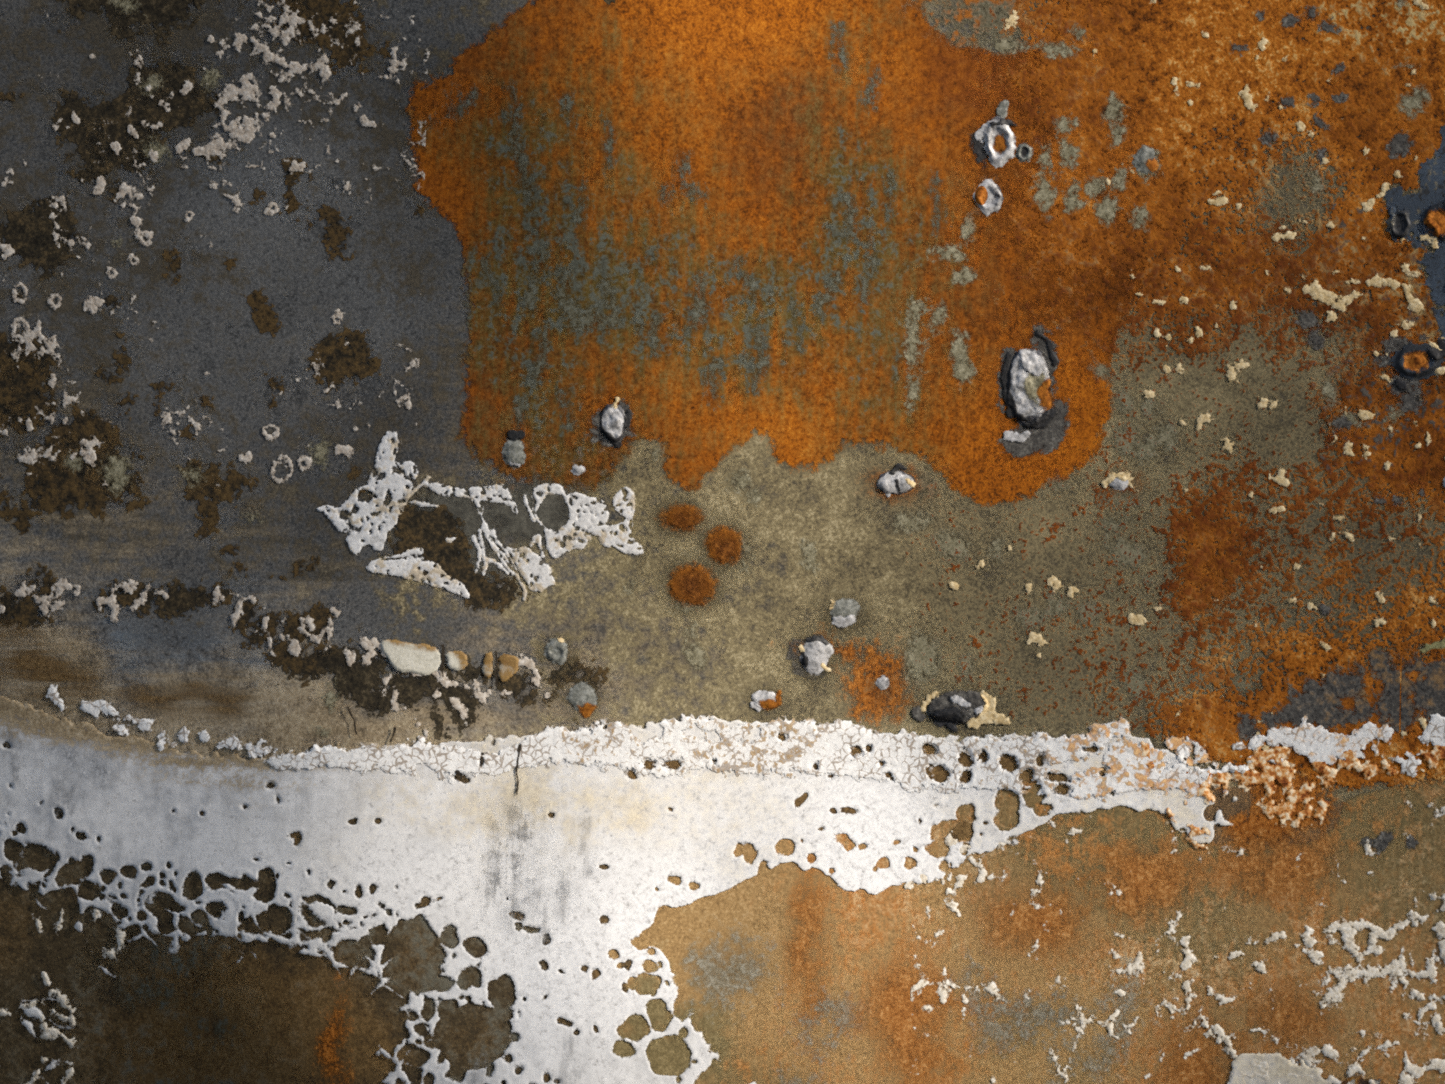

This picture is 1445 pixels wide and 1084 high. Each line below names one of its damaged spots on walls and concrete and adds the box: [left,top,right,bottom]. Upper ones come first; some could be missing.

peeling [175,0,430,213]
water stain [1399,87,1431,119]
peeling [47,49,193,341]
peeling [1284,125,1445,448]
peeling [0,280,102,475]
water stain [1090,364,1178,465]
peeling [317,431,643,601]
water stain [894,474,970,562]
water stain [1095,488,1153,585]
water stain [904,632,977,689]
peeling [0,562,1445,1084]
rust [1103,845,1199,921]